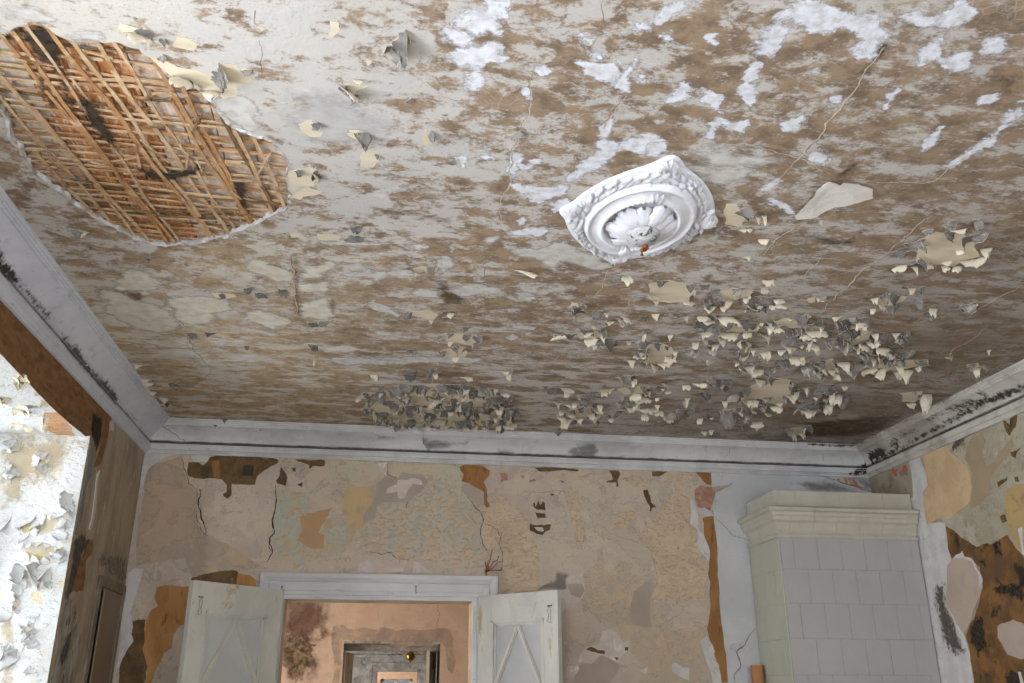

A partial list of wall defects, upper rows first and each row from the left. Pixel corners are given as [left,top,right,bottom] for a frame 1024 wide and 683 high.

leakage [0,7,116,146]
peeling [118,23,253,102]
efflorescence [440,0,511,91]
leakage [664,0,891,184]
efflorescence [897,0,1007,73]
leakage [506,118,668,213]
peeling [355,327,521,434]
peeling [542,218,992,441]
peeling [0,440,100,683]
crack [267,485,277,562]
crack [467,497,503,572]
peeling [837,457,983,683]